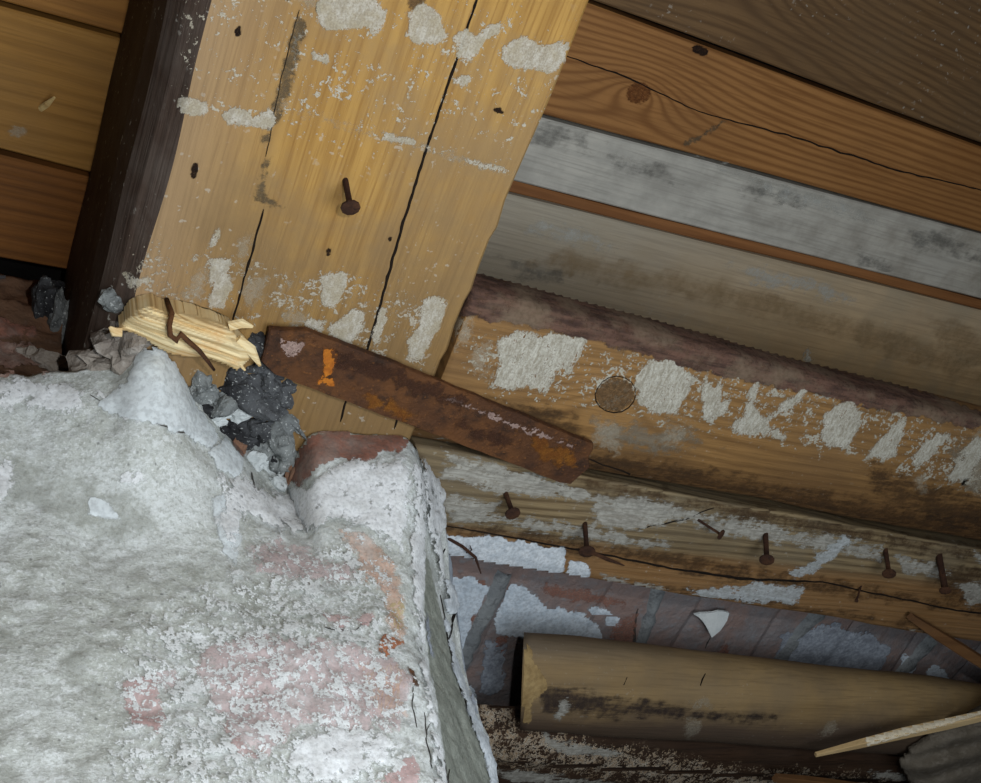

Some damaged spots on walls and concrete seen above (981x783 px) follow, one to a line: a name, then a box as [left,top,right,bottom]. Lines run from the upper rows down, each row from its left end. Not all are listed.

crack [466,0,478,29]
crack [265,11,299,157]
crack [567,56,981,191]
crack [232,209,264,321]
crack [366,55,459,350]
rust [318,349,336,386]